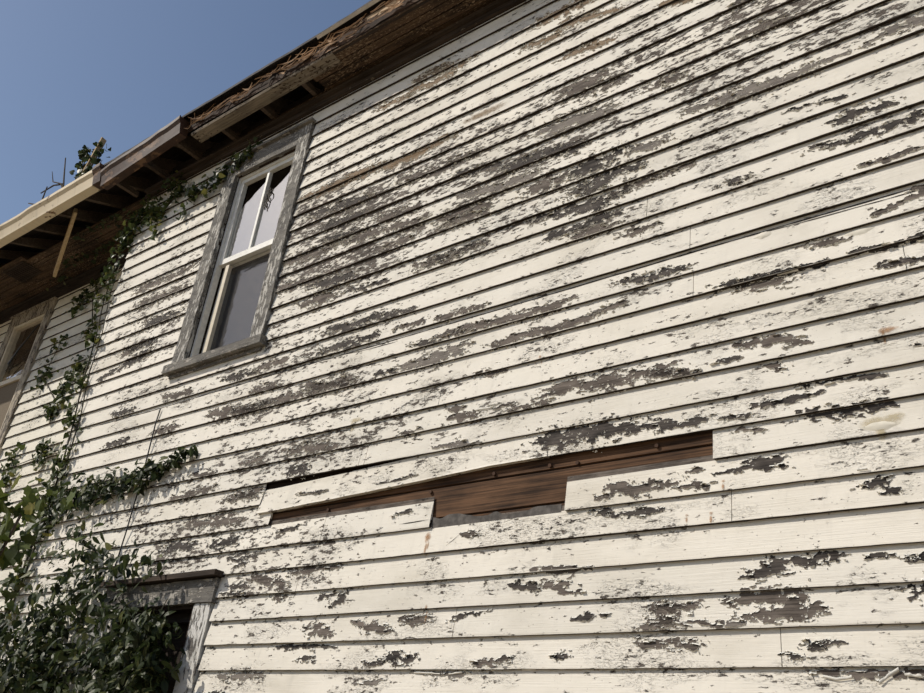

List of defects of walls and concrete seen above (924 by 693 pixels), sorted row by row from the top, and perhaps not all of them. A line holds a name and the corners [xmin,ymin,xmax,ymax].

peeling [781,93,924,157]
peeling [282,61,697,267]
peeling [705,231,924,296]
peeling [204,294,629,427]
peeling [431,332,814,451]
peeling [520,372,900,457]
peeling [585,454,795,520]
peeling [507,564,594,597]
peeling [633,549,851,655]
peeling [272,621,338,664]
peeling [360,649,515,681]
peeling [777,638,924,682]